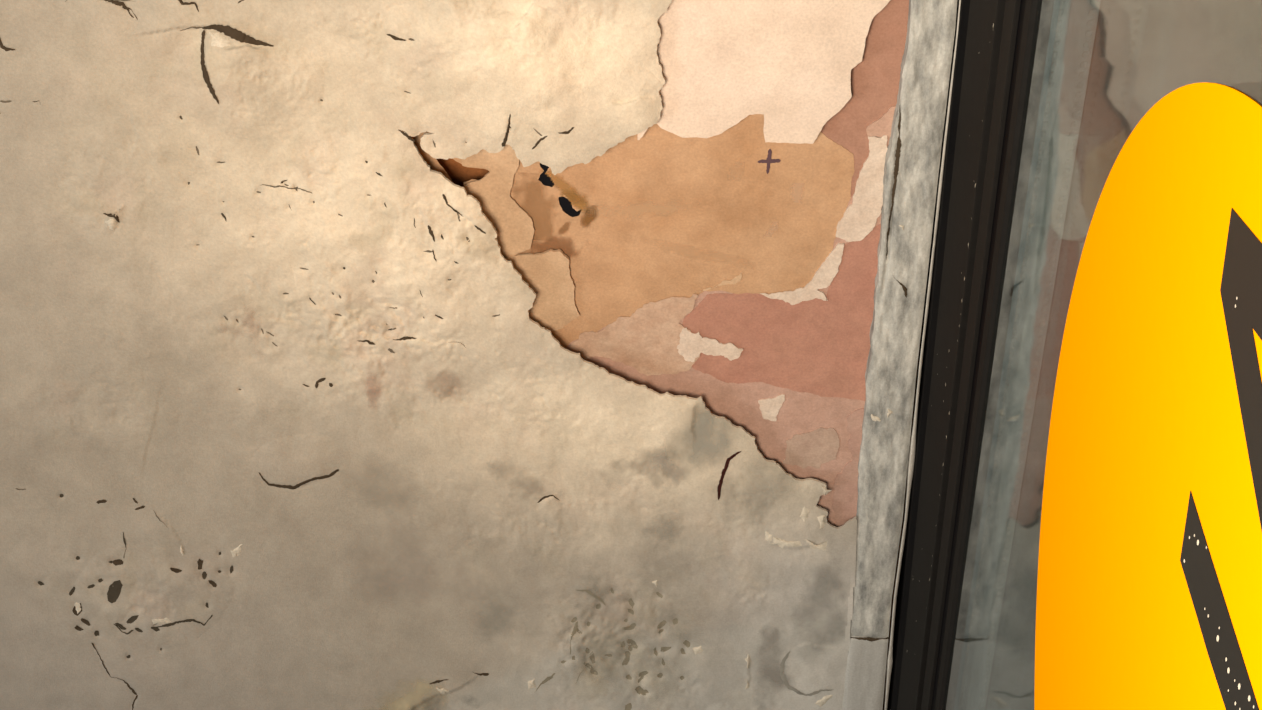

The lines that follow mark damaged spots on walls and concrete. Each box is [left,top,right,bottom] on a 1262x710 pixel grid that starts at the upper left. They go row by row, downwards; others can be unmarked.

crack [104,0,137,19]
crack [0,38,15,51]
crack [178,0,273,104]
flaking render [410,0,909,551]
crack [259,469,339,489]
crack [717,451,741,500]
crack [96,498,167,527]
crack [92,643,138,710]